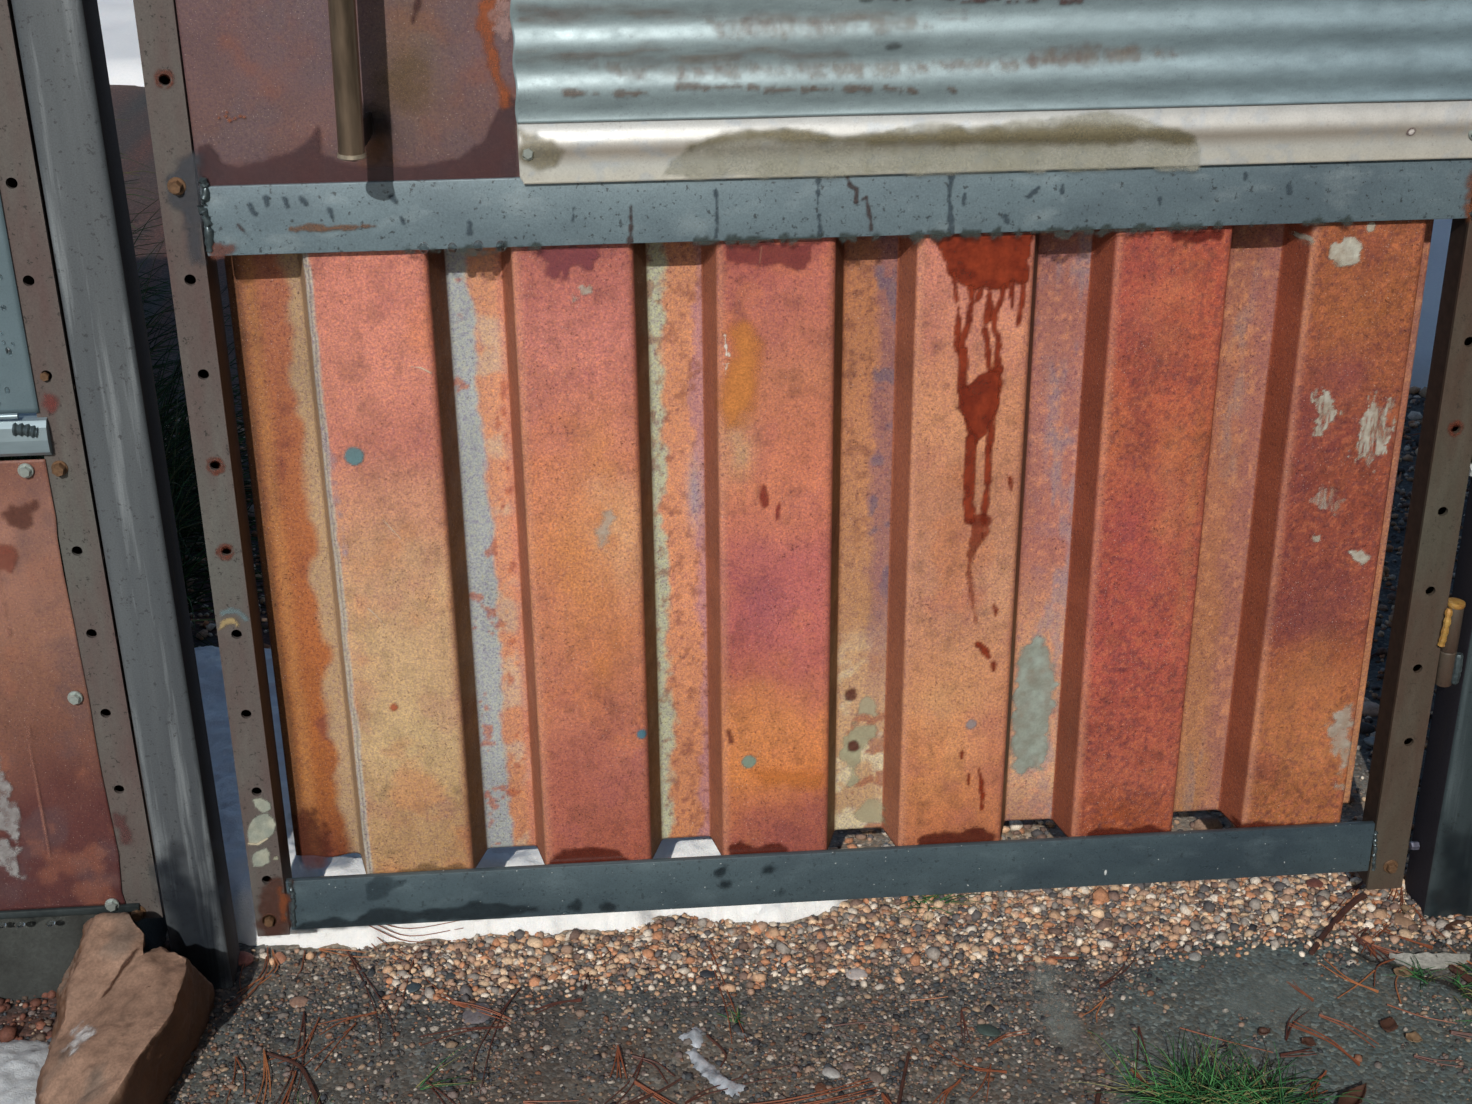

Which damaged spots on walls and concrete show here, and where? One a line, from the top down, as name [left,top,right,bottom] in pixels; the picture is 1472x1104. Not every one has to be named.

water stain [667,113,1198,269]
peeling [1294,222,1375,266]
corrosion [934,231,1033,575]
peeling [1311,390,1342,436]
peeling [1348,396,1395,459]
corrosion [760,486,780,520]
peeling [1349,551,1369,564]
corrosion [0,459,130,911]
corrosion [975,642,995,671]
peeling [1011,636,1059,774]
corrosion [961,751,985,811]
corrosion [256,878,291,936]